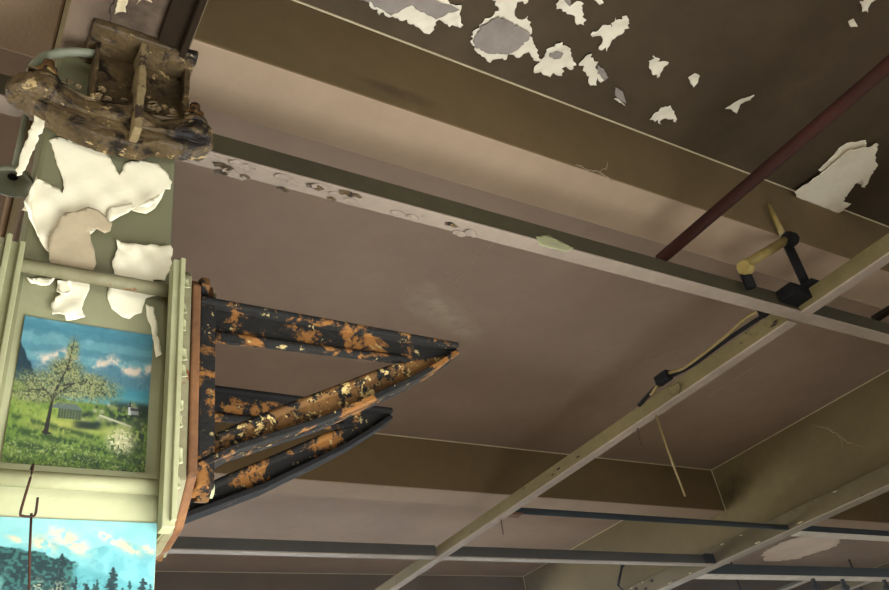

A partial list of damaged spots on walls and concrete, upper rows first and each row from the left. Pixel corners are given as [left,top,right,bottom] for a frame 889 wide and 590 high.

peeling [363,0,463,34]
peeling [470,0,629,86]
peeling [614,87,626,105]
peeling [649,56,669,78]
peeling [650,106,677,124]
peeling [688,73,700,88]
peeling [725,95,754,114]
peeling [795,140,878,213]
peeling [15,115,173,282]
peeling [26,277,90,321]
peeling [107,288,162,357]